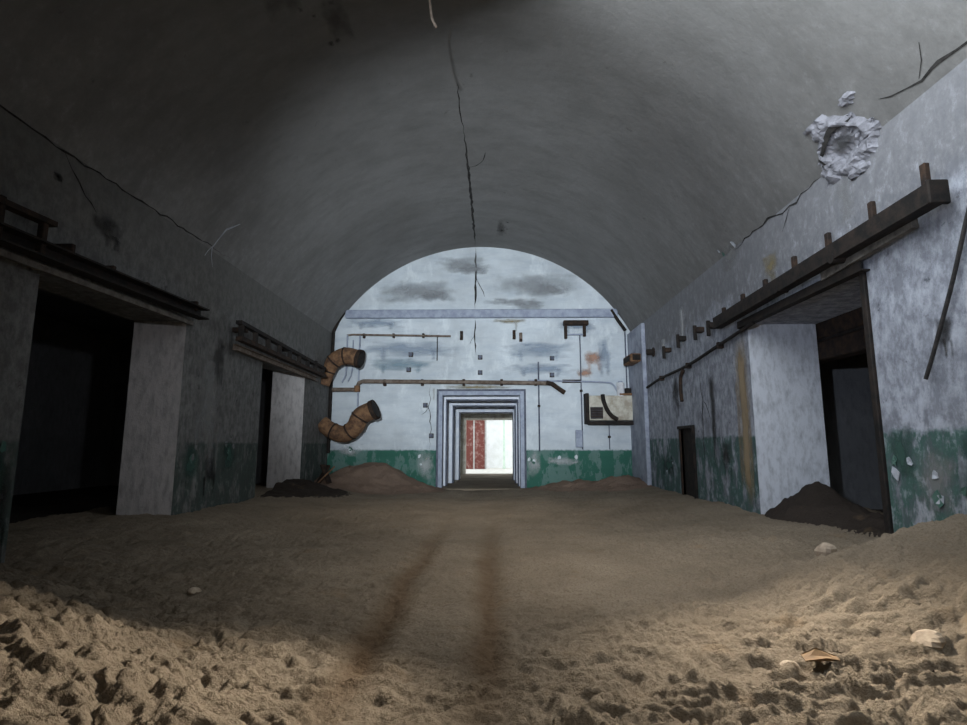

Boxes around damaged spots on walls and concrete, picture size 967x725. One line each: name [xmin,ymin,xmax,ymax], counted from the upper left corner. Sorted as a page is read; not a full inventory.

crack [880,41,967,99]
spalling [802,91,882,189]
crack [457,84,485,352]
crack [736,179,818,249]